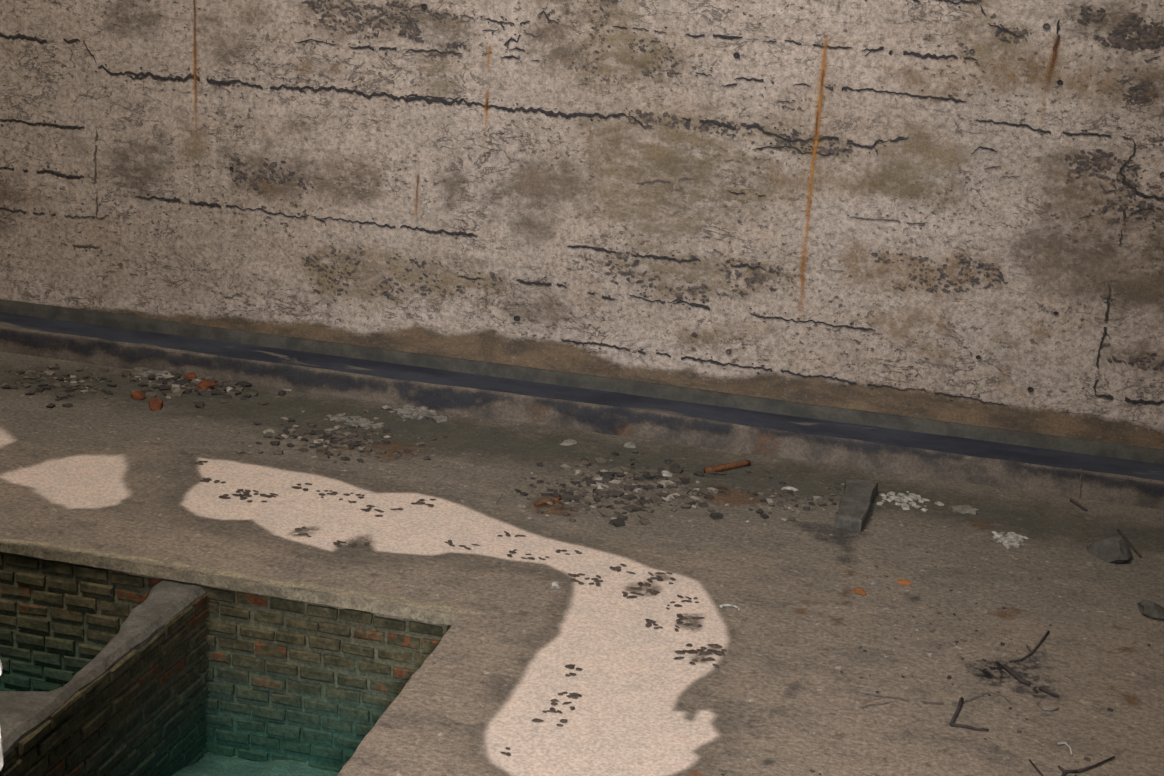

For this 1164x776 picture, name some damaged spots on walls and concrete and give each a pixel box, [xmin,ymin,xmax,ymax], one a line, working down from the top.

crack [907,0,1024,37]
crack [0,33,648,129]
corrosion [806,43,827,235]
crack [133,192,477,240]
water stain [0,329,862,497]
crack [516,277,710,311]
water stain [83,309,1164,449]
crack [567,240,701,264]
crack [749,308,876,336]
water stain [1023,232,1164,305]
crack [1093,284,1164,405]
water stain [870,485,1164,550]